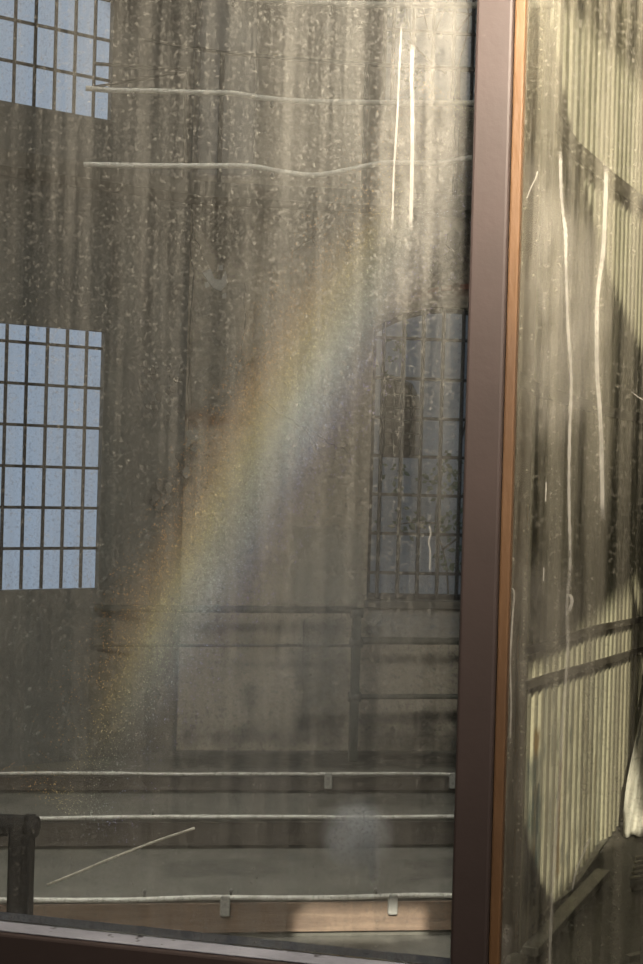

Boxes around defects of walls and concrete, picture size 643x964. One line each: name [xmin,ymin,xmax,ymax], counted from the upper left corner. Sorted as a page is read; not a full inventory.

corrosion [532,731,540,887]